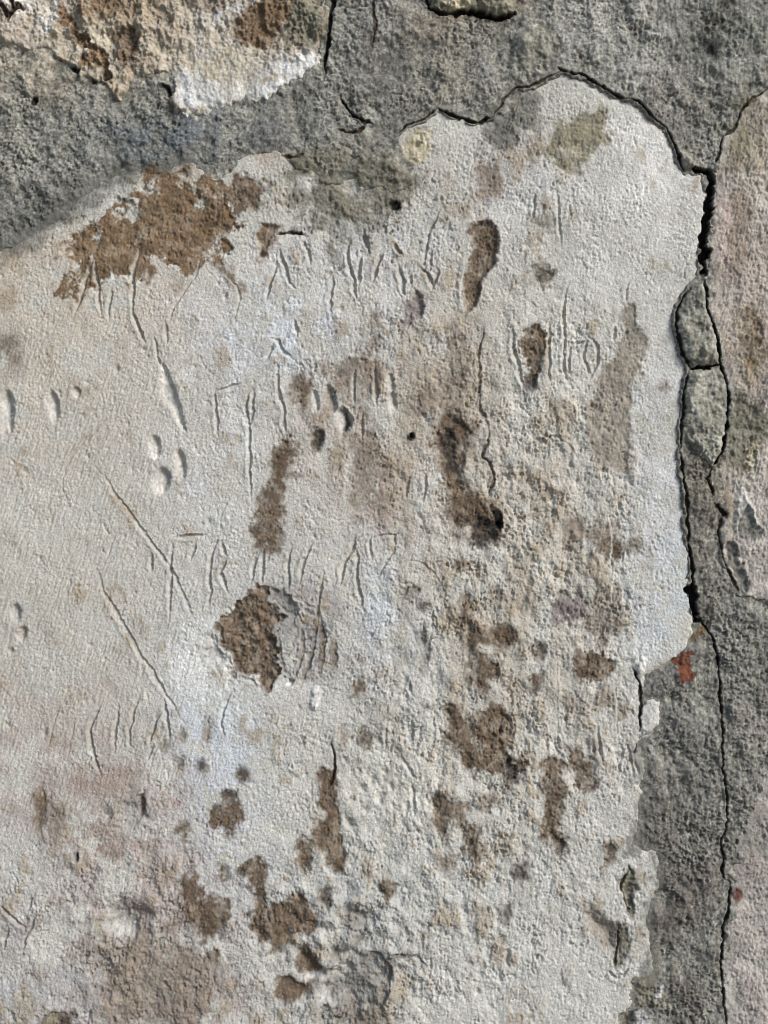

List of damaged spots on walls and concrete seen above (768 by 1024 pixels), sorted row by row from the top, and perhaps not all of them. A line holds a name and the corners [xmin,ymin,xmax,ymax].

spalling [0,0,24,22]
spalling [55,2,140,85]
crack [339,100,372,134]
spalling [257,224,303,257]
damp [288,374,313,408]
damp [250,438,303,555]
damp [350,433,386,506]
damp [417,322,504,546]
crack [399,69,763,1024]
spalling [203,583,297,693]
corrosion [671,627,706,683]
crack [329,744,337,786]